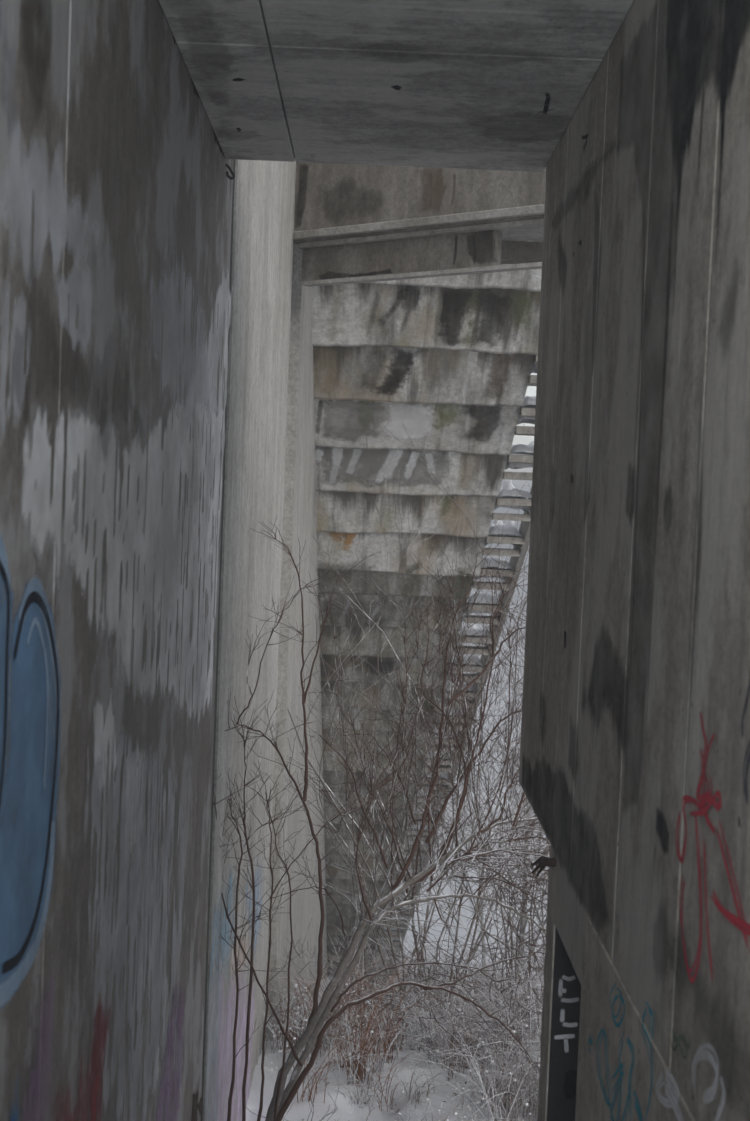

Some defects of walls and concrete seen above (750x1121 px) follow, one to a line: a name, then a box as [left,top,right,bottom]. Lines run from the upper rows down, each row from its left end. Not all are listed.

damp [656,0,750,225]
damp [380,287,420,324]
damp [440,290,524,346]
damp [315,351,448,487]
damp [465,355,513,441]
damp [522,757,606,926]